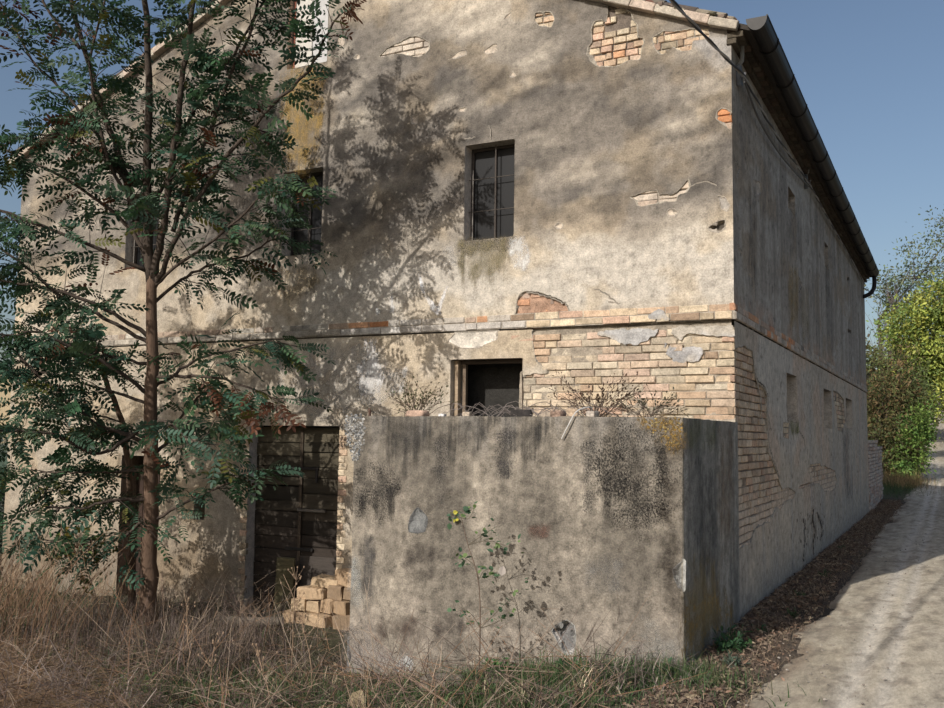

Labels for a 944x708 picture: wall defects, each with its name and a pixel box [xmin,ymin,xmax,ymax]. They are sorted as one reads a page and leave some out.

spalling [379,36,430,57]
spalling [534,11,555,28]
spalling [586,5,710,67]
spalling [716,108,732,130]
spalling [630,179,691,217]
spalling [515,291,570,314]
peeling [448,329,499,349]
spalling [511,309,783,549]
damp [583,418,682,528]
damp [354,462,401,523]
spalling [408,507,428,534]
spalling [552,619,576,656]